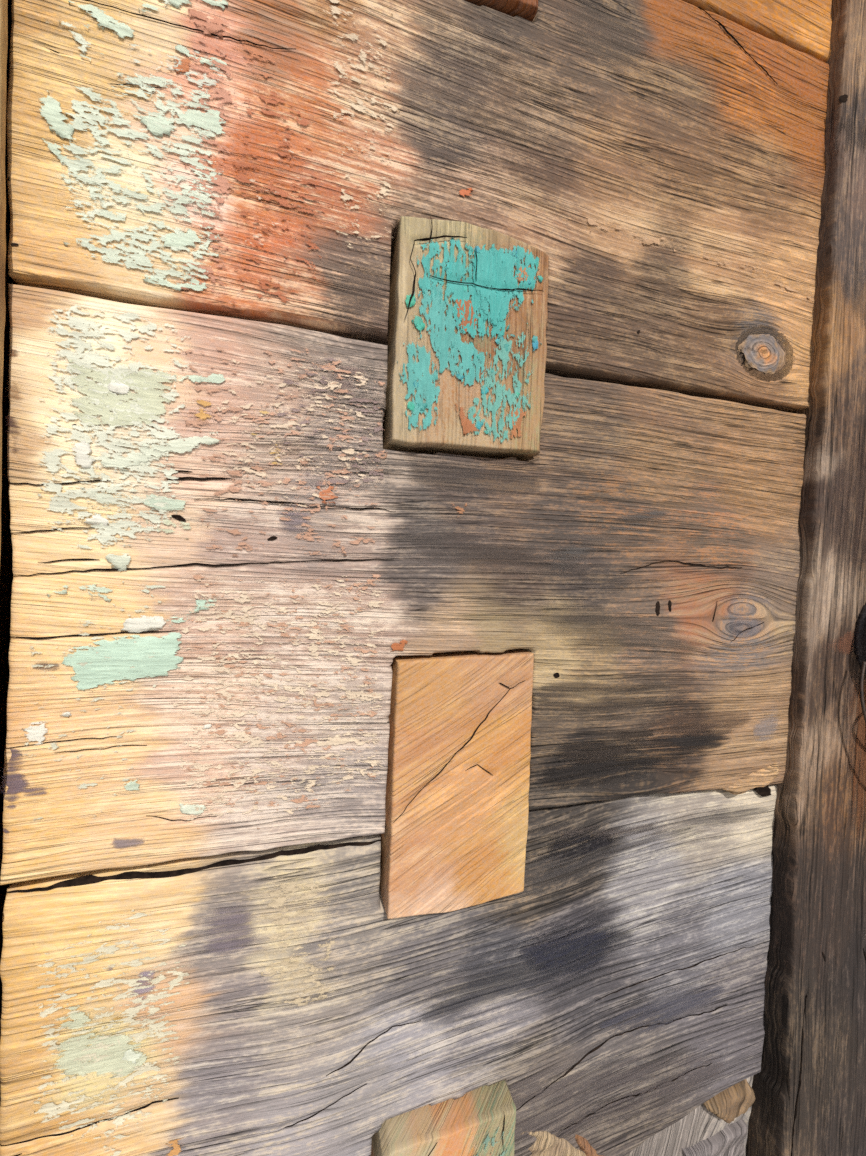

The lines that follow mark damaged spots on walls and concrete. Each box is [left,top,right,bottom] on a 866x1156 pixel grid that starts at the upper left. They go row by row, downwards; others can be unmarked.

peeling [59,21,91,53]
peeling [68,0,134,38]
peeling [38,90,115,220]
peeling [397,238,543,442]
peeling [68,359,225,428]
peeling [71,400,221,471]
crack [9,479,109,487]
crack [167,470,396,512]
crack [15,525,112,533]
crack [12,558,385,577]
peeling [62,599,216,692]
crack [6,680,525,893]